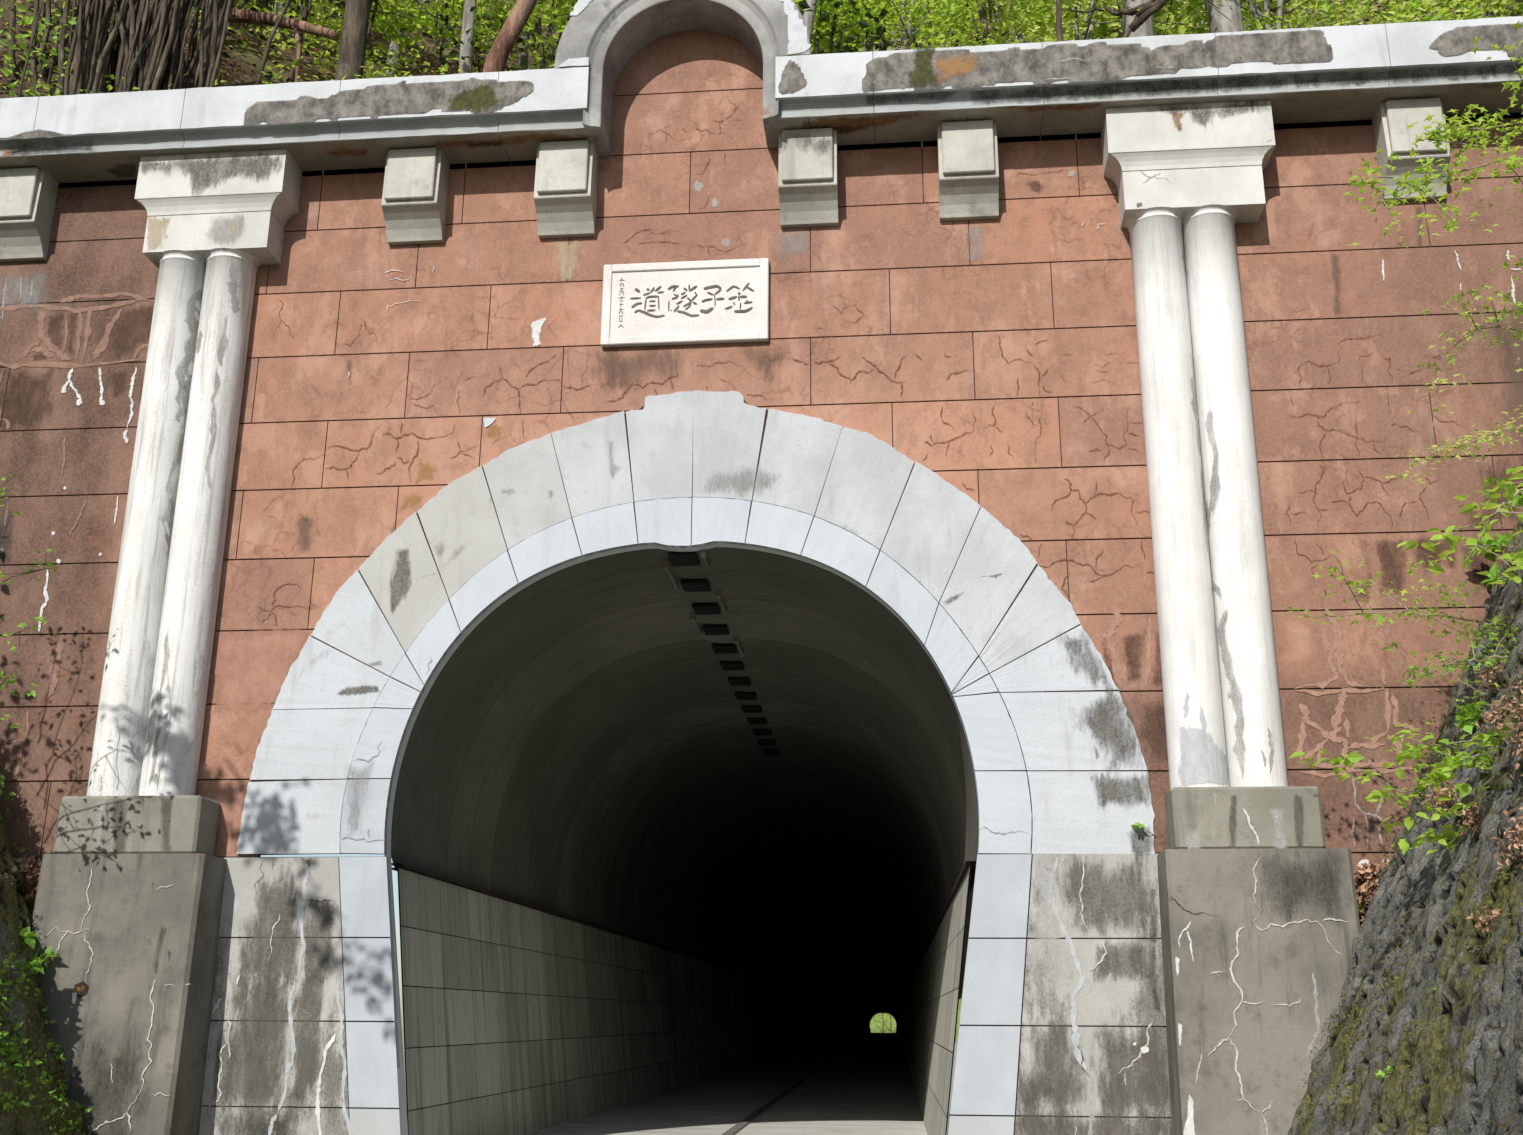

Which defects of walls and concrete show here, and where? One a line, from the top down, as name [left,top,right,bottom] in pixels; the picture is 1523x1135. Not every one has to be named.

peeling [244,78,533,125]
peeling [862,29,1333,103]
peeling [1429,22,1523,59]
crack [0,292,149,429]
damp [5,306,153,443]
crack [292,301,1154,688]
crack [1286,333,1461,778]
damp [1066,635,1168,806]
damp [212,864,336,1135]
damp [1019,831,1168,1135]
crack [1118,1023,1152,1084]
crack [1169,809,1348,1135]